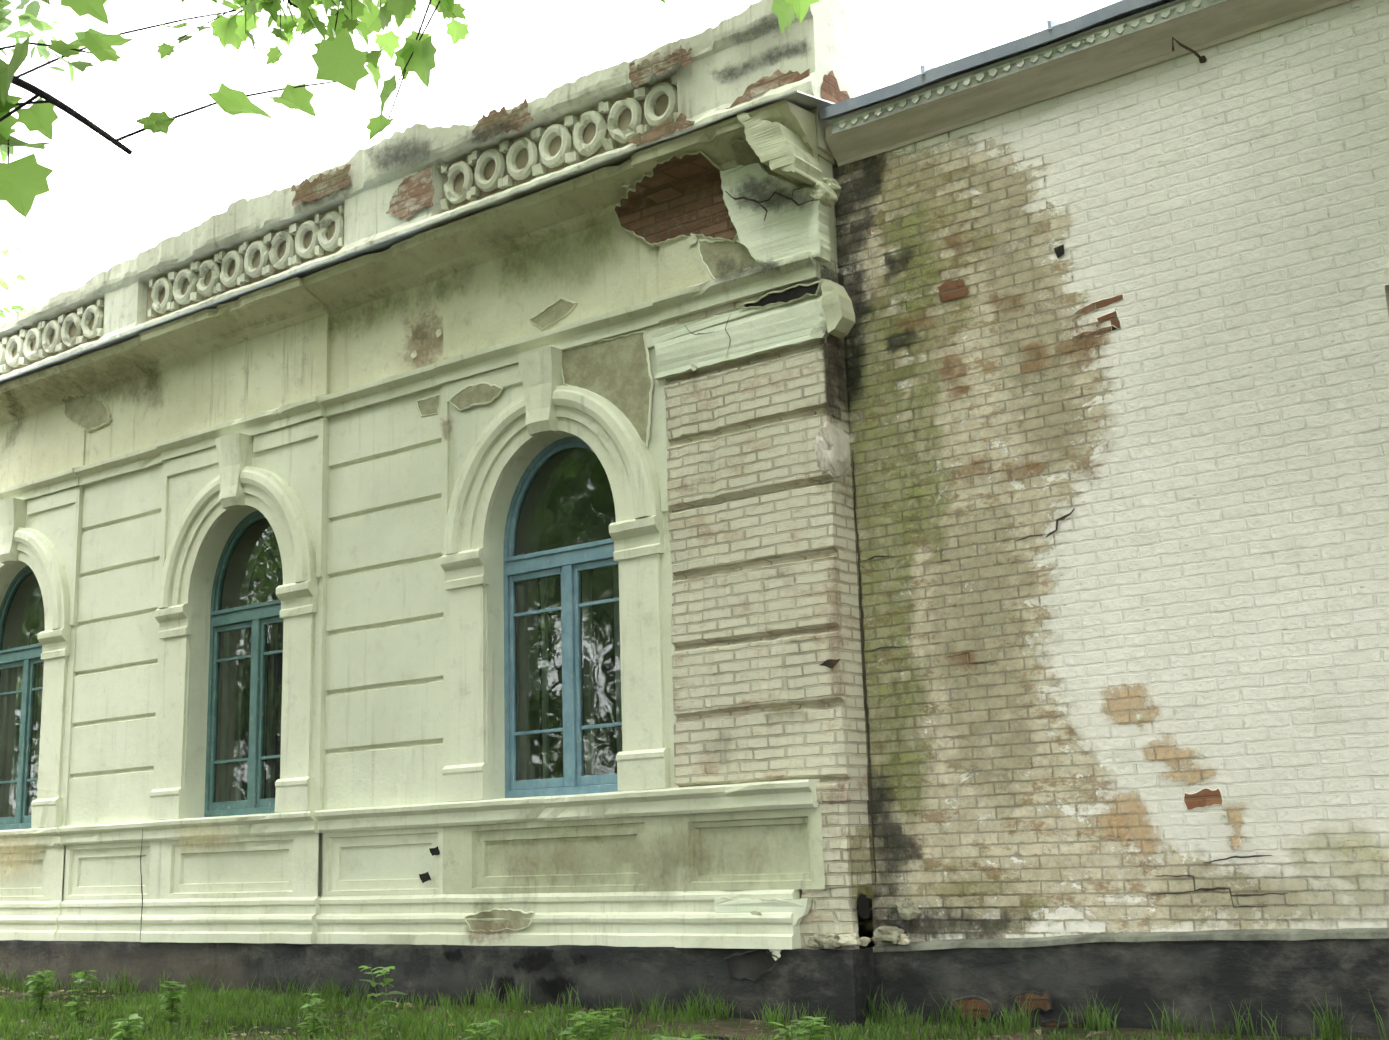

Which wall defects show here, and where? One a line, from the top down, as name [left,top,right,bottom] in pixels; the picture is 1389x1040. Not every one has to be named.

flaking render [629,45,692,88]
flaking render [726,68,850,109]
flaking render [473,98,534,143]
flaking render [291,164,351,207]
crack [725,186,813,221]
leakage [820,152,937,422]
leakage [907,363,945,542]
peeling [561,132,1293,940]
crack [1016,508,1075,541]
leakage [850,667,1044,944]
crack [1155,855,1288,908]
flaking render [464,908,535,934]